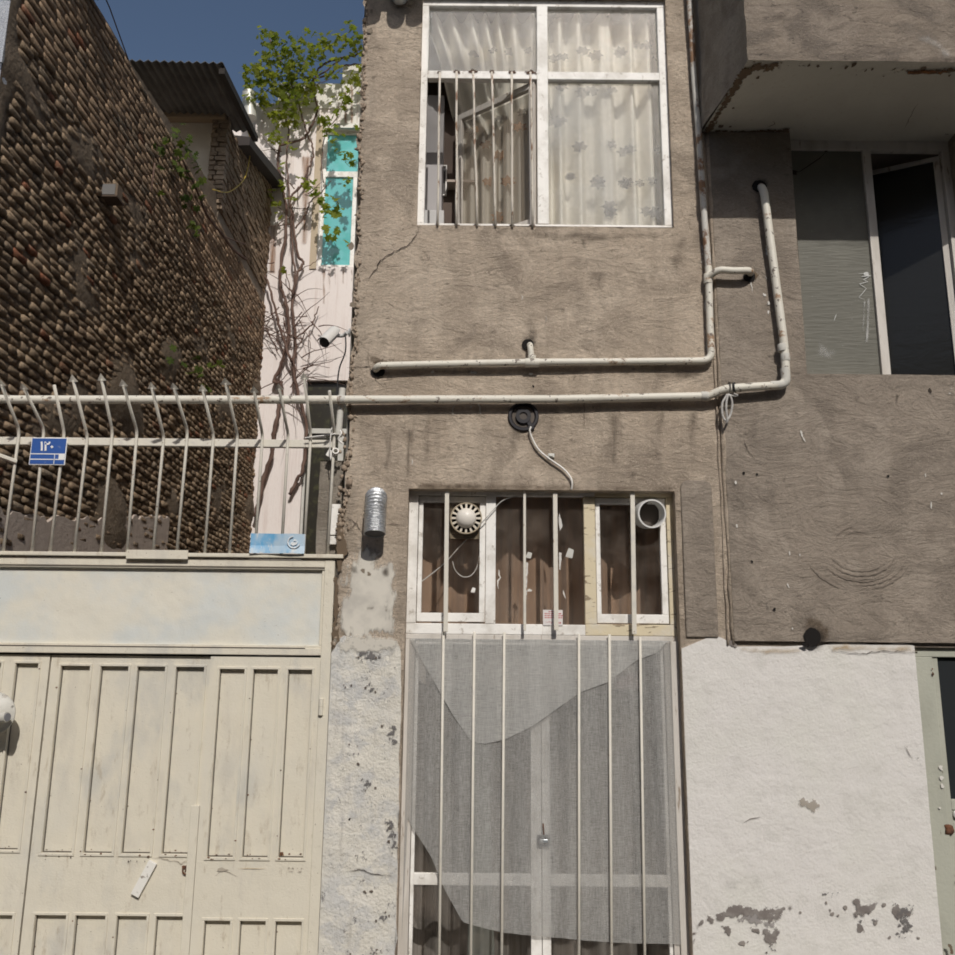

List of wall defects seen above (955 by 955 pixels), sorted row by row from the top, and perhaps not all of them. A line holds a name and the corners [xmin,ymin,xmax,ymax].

crack [352,228,419,294]
peeling [318,0,401,955]
peeling [799,798,820,812]
peeling [693,905,802,953]
peeling [822,891,920,939]